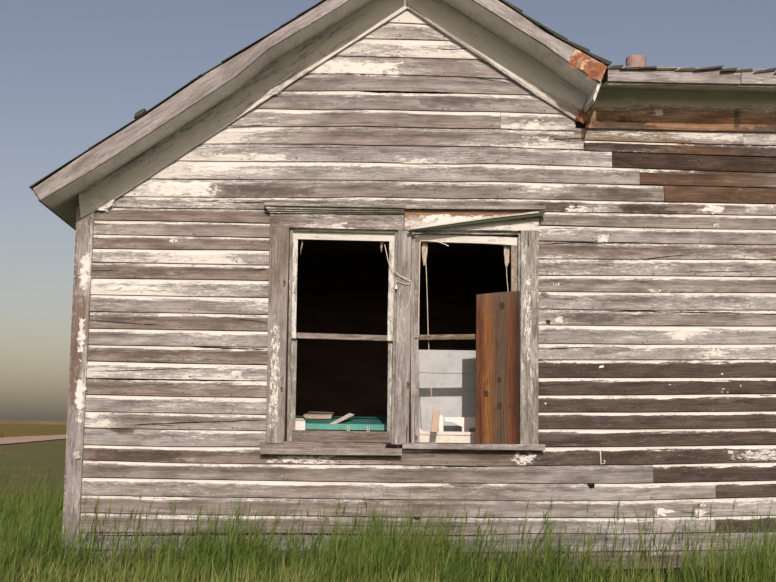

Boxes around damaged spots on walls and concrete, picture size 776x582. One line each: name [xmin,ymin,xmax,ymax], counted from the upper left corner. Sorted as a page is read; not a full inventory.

rust [570,56,604,79]
peeling [87,194,115,212]
peeling [410,214,518,231]
peeling [77,318,87,362]
peeling [268,314,281,435]
peeling [266,454,339,465]
peeling [510,452,539,466]
peeling [724,450,776,461]